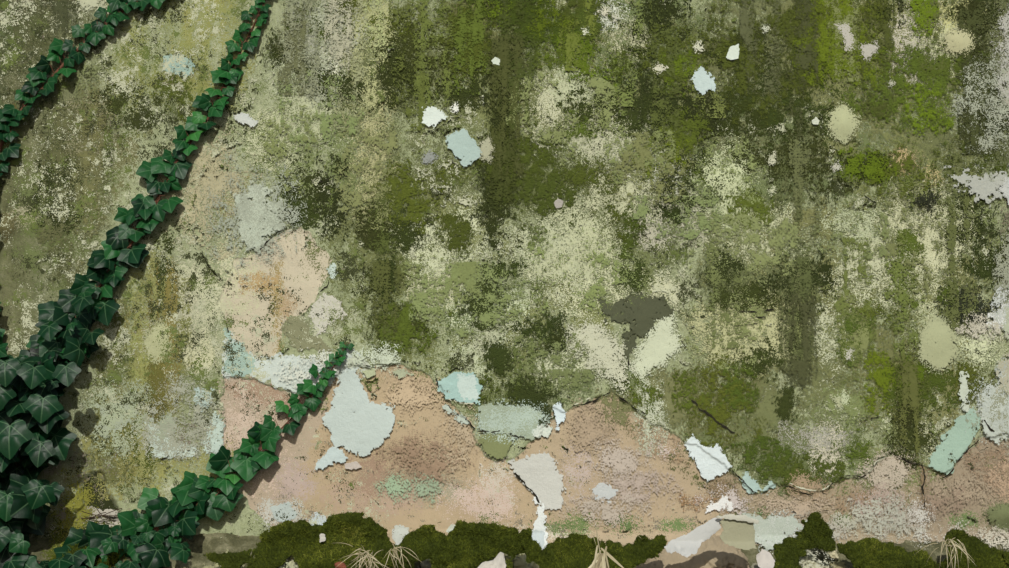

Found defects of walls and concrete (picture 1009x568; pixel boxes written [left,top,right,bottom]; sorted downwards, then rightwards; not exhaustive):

peeling [421,106,448,129]
peeling [445,128,482,167]
peeling [689,66,716,95]
damp [688,27,727,126]
peeling [220,227,332,359]
peeling [220,364,1009,550]
crack [691,400,743,438]
crack [785,410,1009,516]